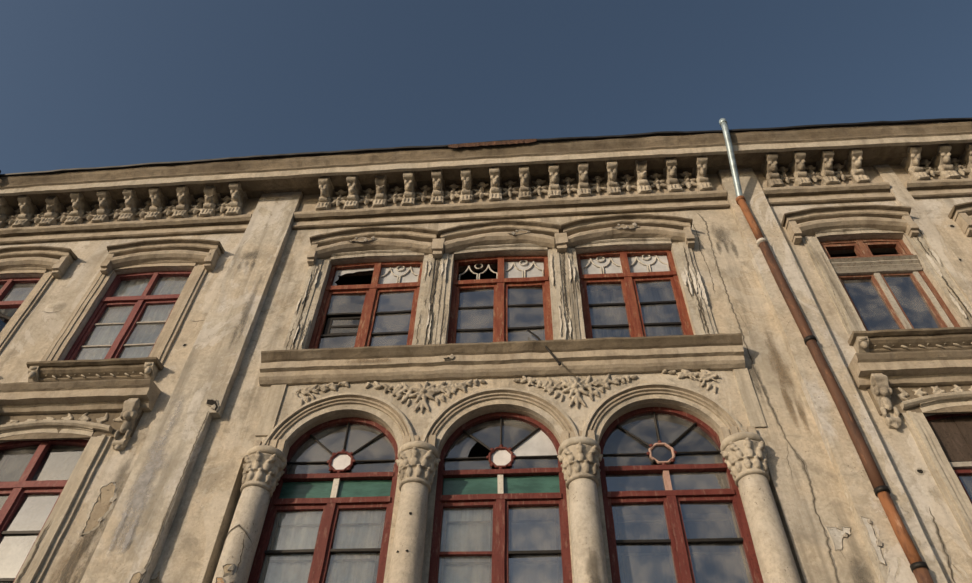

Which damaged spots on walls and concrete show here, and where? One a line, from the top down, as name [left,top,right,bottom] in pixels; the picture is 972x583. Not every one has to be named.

crack [688,213,845,583]
flaking render [79,481,118,537]
flaking render [825,524,851,551]
crack [929,508,961,583]
flaking render [129,568,160,583]